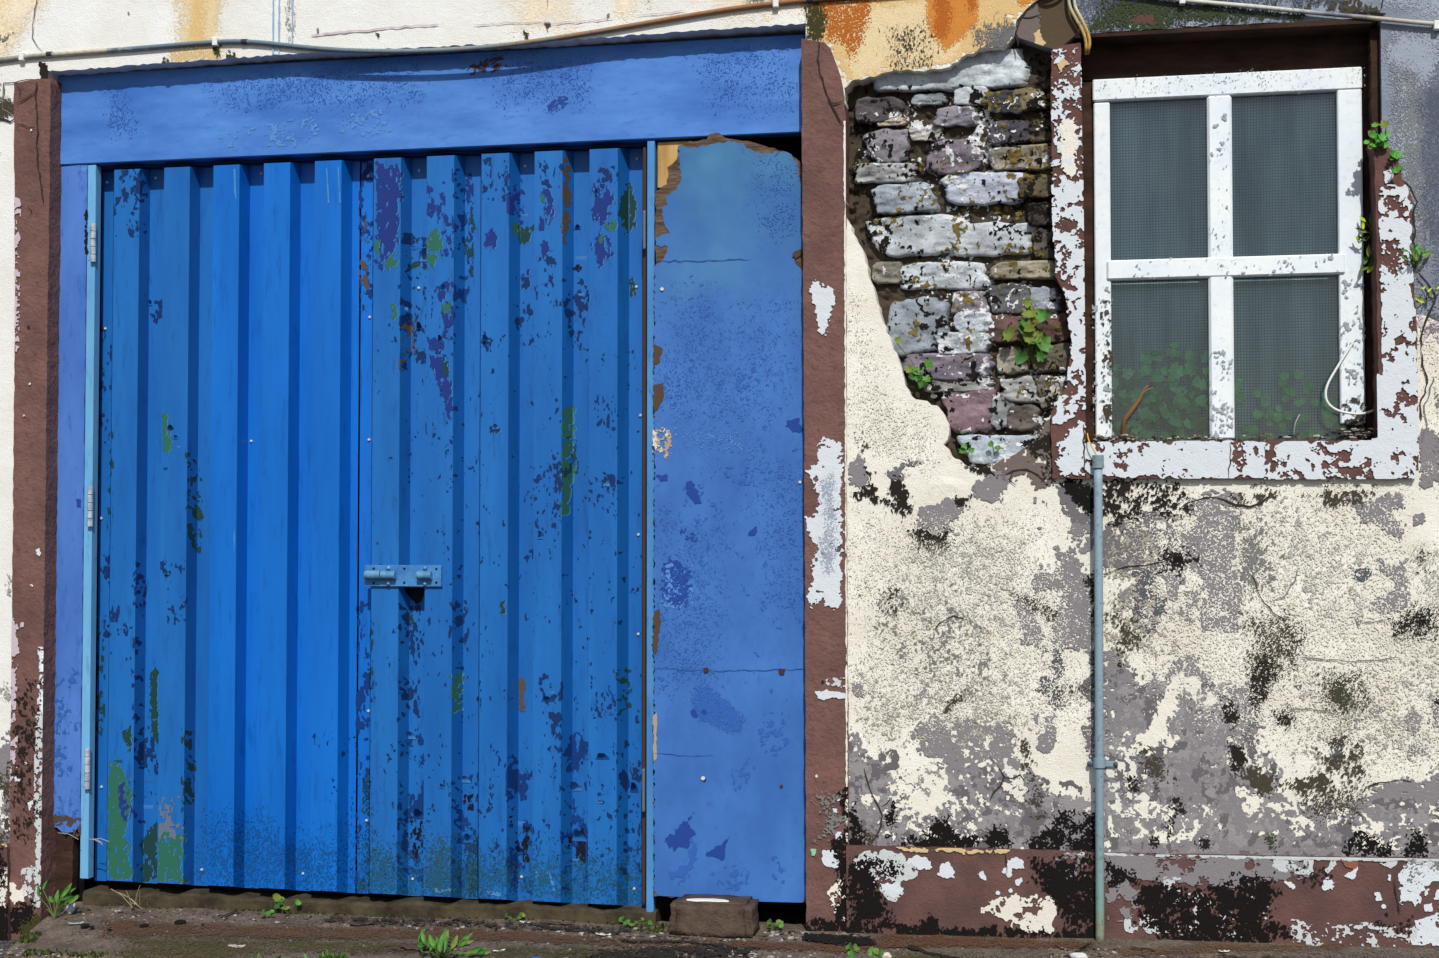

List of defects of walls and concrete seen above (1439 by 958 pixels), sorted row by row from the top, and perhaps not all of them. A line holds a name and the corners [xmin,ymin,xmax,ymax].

leakage [482,0,1037,88]
rust [801,0,888,66]
rust [925,0,979,53]
leakage [1072,0,1439,341]
leakage [1148,544,1203,584]
leakage [1048,570,1151,710]
leakage [1218,481,1439,892]
peeling [0,730,11,843]
leakage [806,738,1333,943]
leakage [1375,911,1420,935]